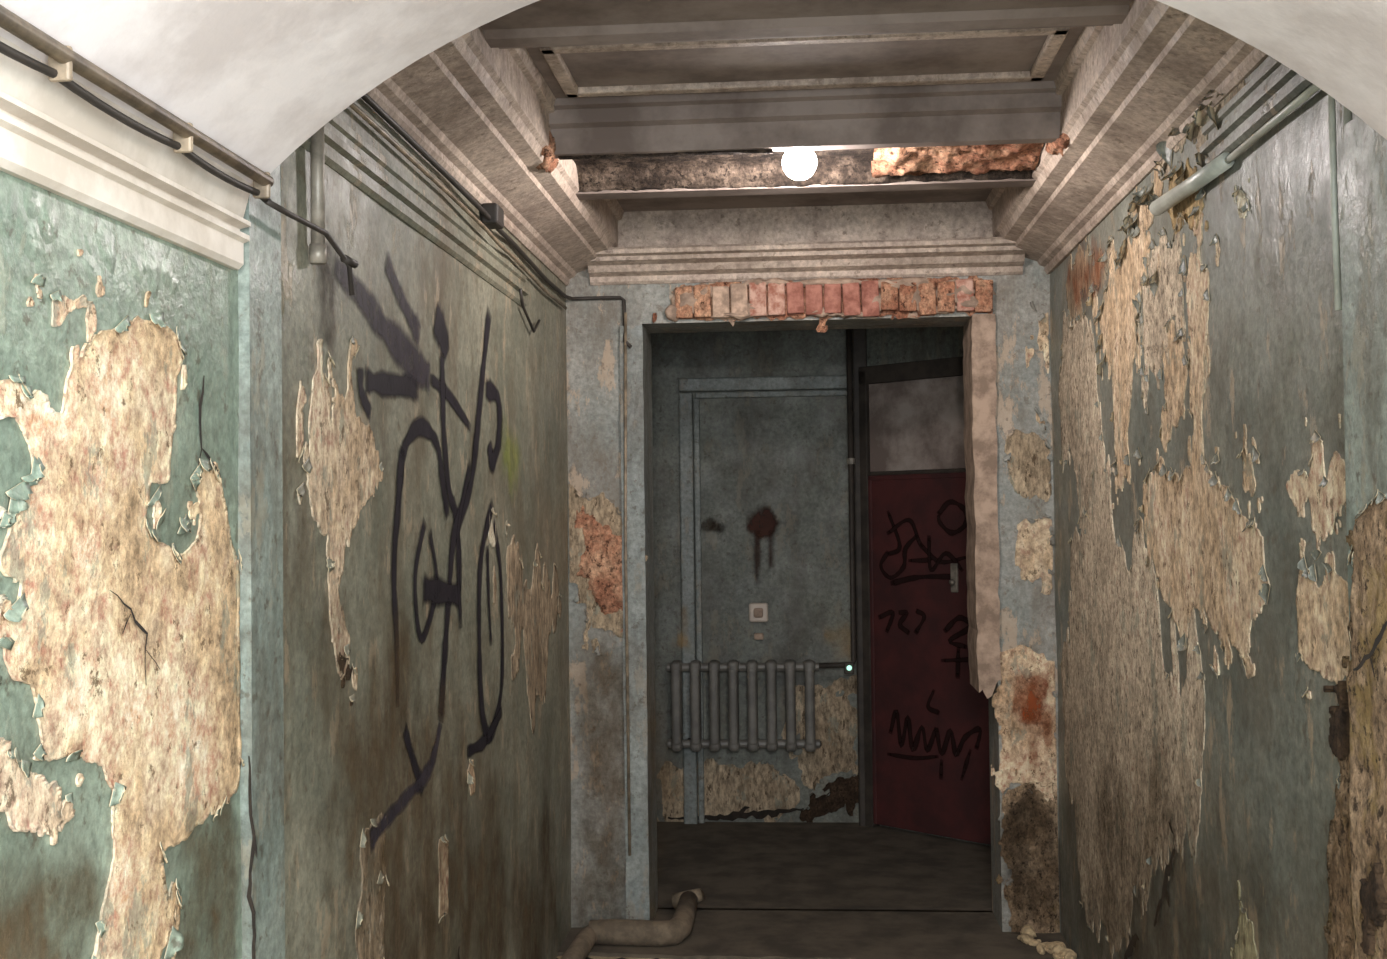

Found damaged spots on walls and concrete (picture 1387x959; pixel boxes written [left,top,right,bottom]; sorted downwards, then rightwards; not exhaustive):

spalling [536,131,1070,192]
peeling [0,274,245,959]
peeling [296,335,384,706]
spalling [488,484,623,734]
peeling [657,675,859,823]
peeling [991,80,1270,959]
spalling [1286,417,1387,959]